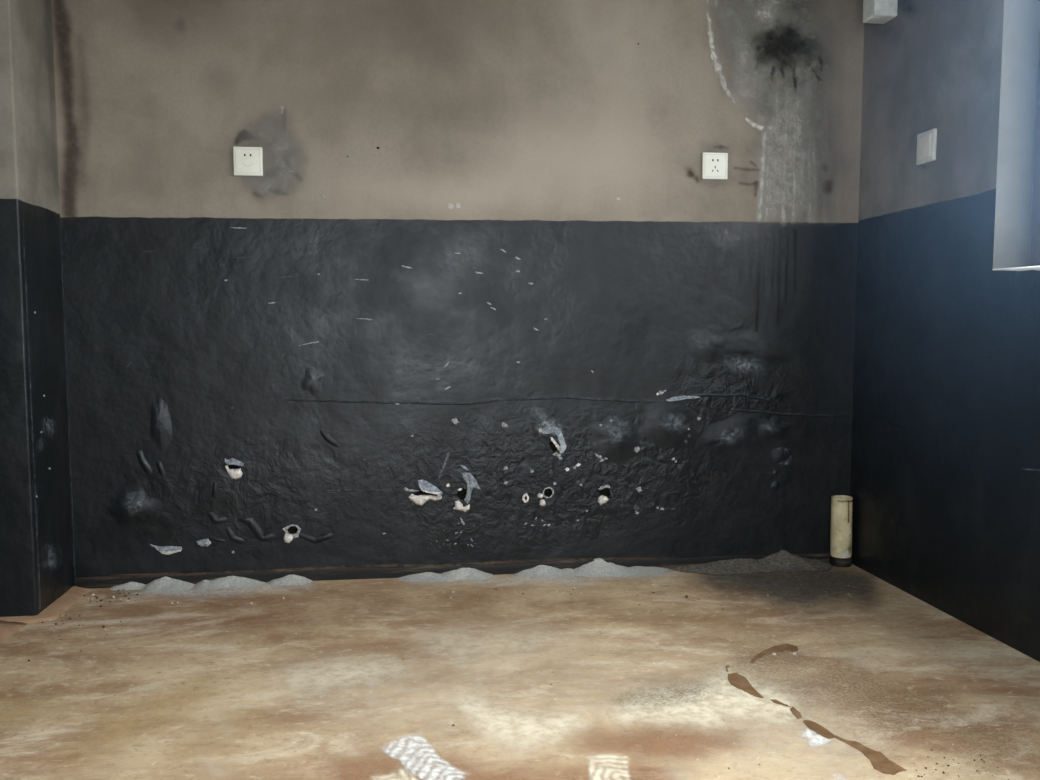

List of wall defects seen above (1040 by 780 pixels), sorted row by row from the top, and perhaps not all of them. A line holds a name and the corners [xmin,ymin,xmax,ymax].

damp [55,0,78,218]
damp [757,106,801,318]
crack [283,397,664,405]
spalling [225,458,244,479]
spalling [511,408,608,531]
spalling [404,456,484,554]
spalling [598,484,613,505]
spalling [283,524,301,543]
peeling [151,544,182,555]